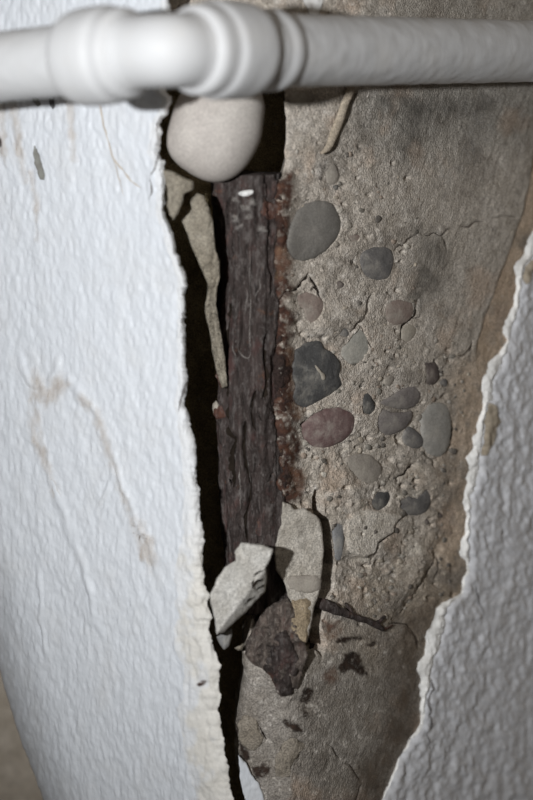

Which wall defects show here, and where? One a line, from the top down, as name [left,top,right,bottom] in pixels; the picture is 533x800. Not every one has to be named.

spalling [160,0,207,13]
spalling [240,0,309,14]
spalling [319,0,533,21]
crack [394,216,513,251]
rust [257,173,304,503]
spalling [147,82,533,800]
crack [416,556,438,589]